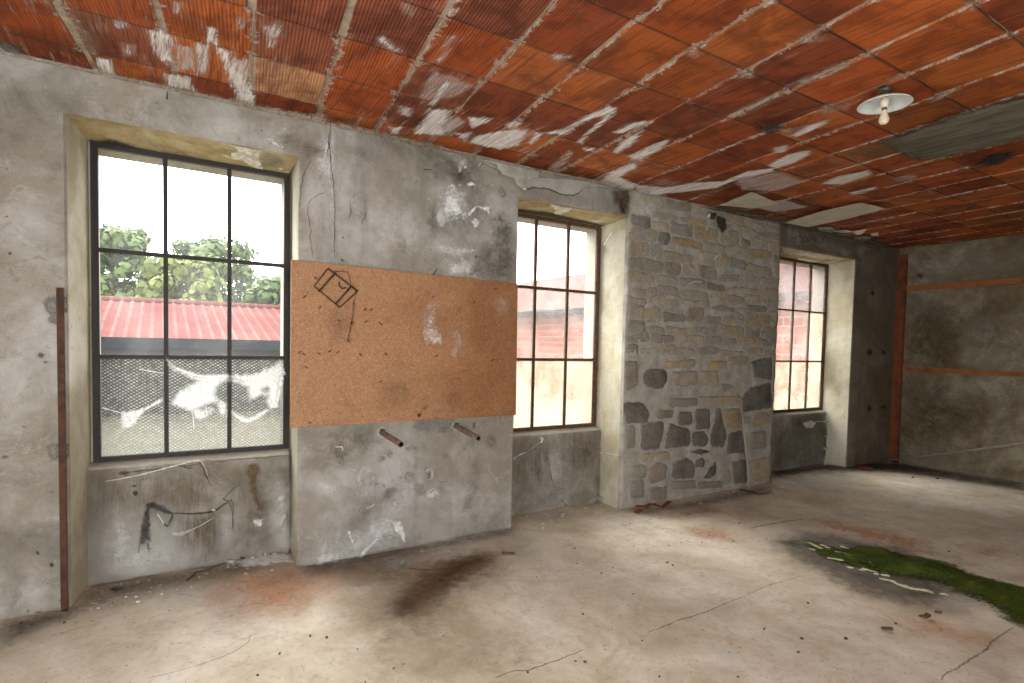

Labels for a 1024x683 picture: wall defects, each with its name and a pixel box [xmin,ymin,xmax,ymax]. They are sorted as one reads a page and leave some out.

peeling [222,144,263,170]
water stain [977,152,1015,167]
crack [299,122,339,258]
corrosion [248,464,260,509]
water stain [783,533,957,602]
crack [496,650,582,678]
crack [941,627,1013,680]